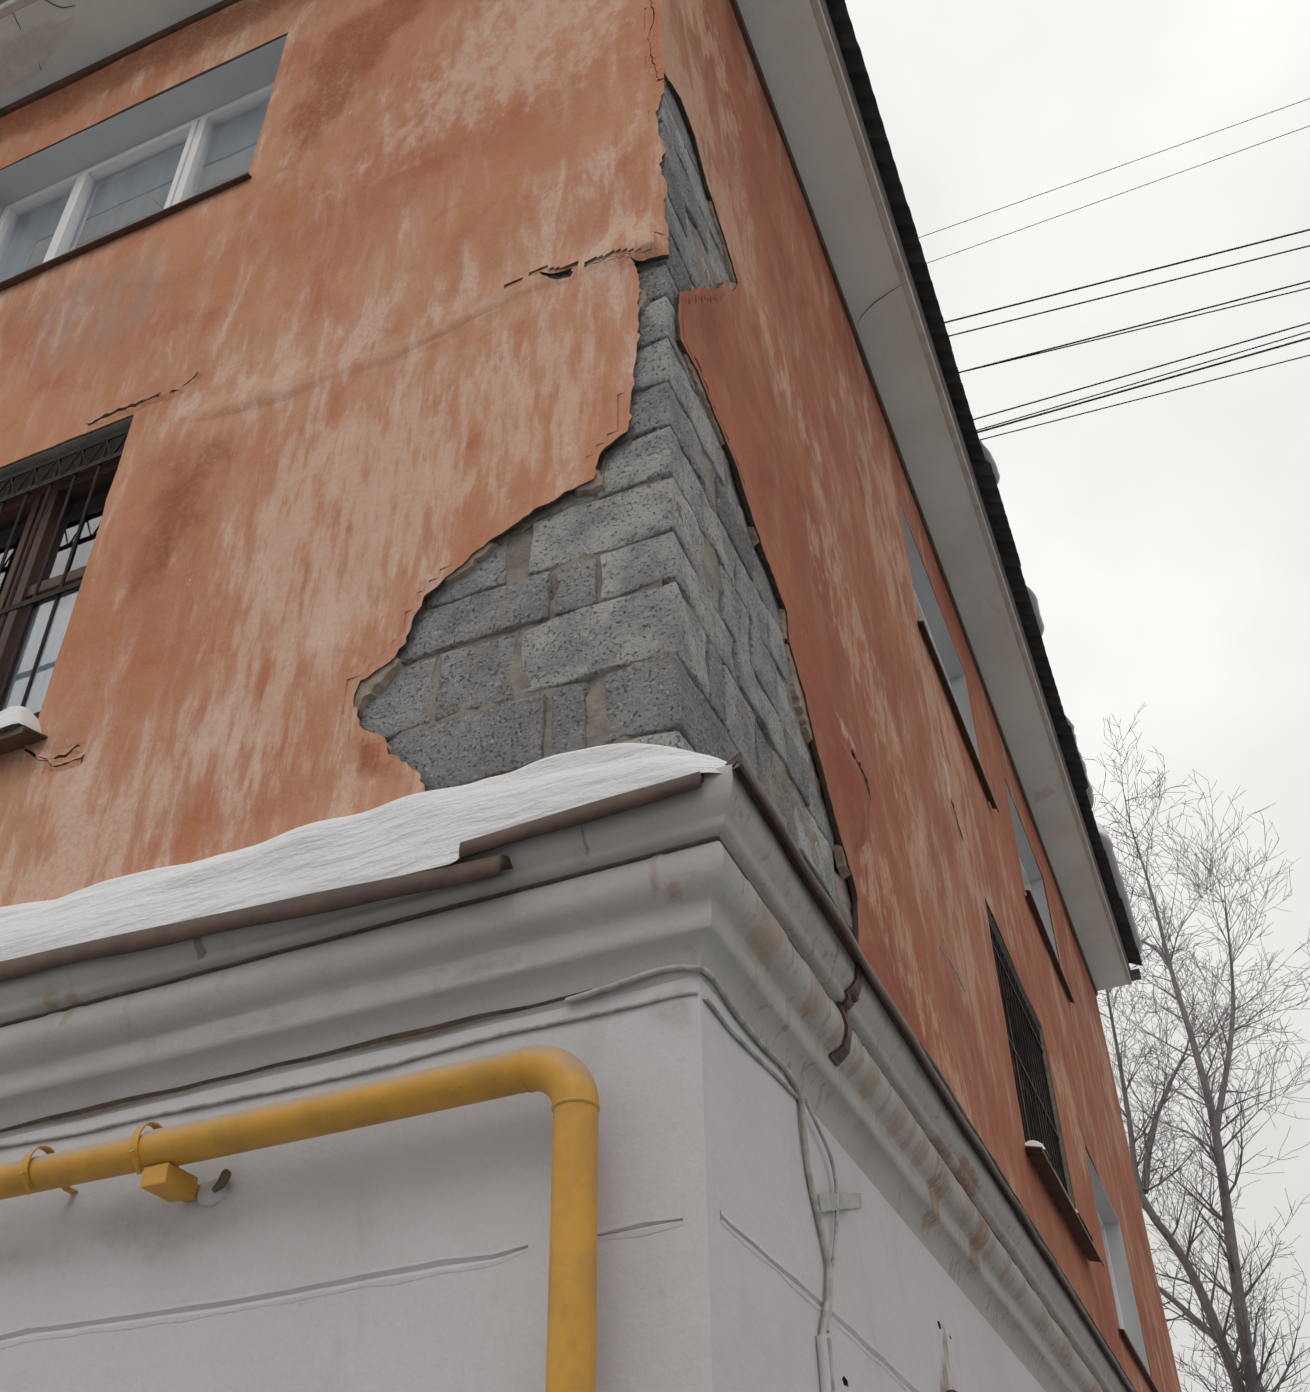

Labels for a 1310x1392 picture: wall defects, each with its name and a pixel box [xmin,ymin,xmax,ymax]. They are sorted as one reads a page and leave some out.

crack [86,372,204,433]
peeling [1,83,991,1154]
crack [20,744,85,771]
crack [853,752,871,801]
crack [0,836,767,1027]
crack [940,948,966,993]
crack [0,989,592,1133]
water stain [819,999,1102,1392]
crack [909,1111,1104,1392]